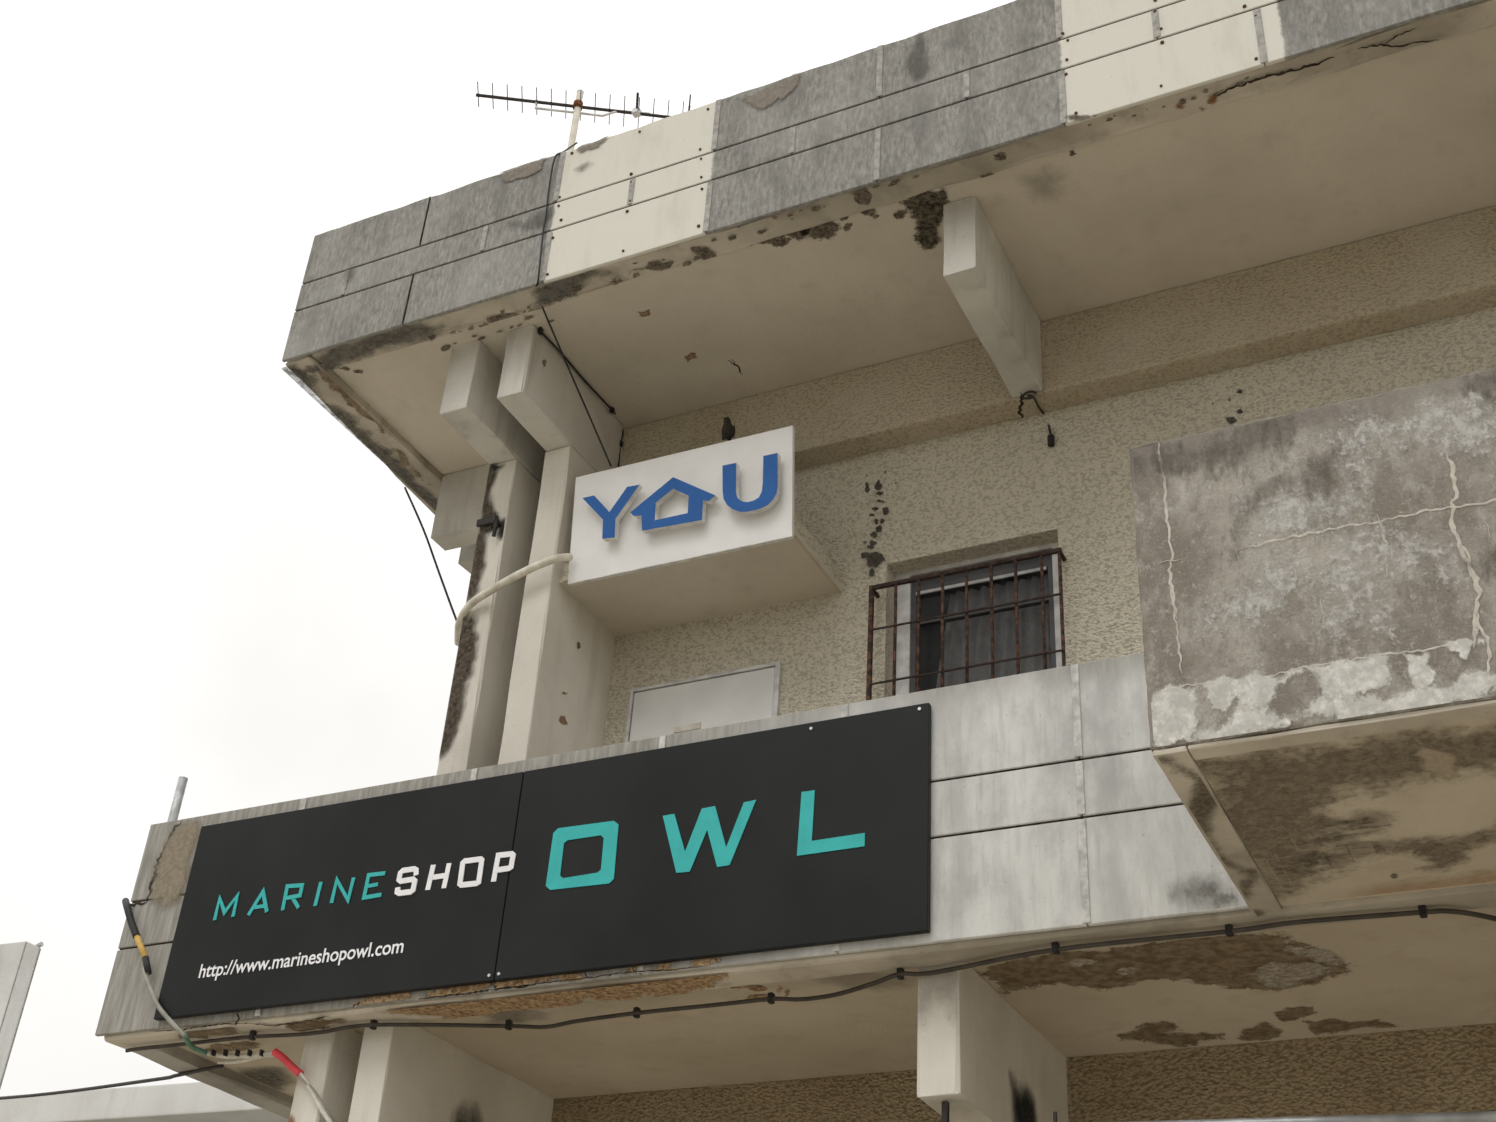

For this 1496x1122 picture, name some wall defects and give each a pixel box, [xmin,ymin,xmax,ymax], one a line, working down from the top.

crack [1208,28,1434,104]
spalling [610,175,951,285]
spalling [427,286,582,351]
water stain [534,272,597,306]
water stain [282,326,441,511]
crack [1155,442,1496,694]
peeling [1151,628,1496,747]
peeling [1415,726,1467,780]
water stain [1158,731,1496,916]
peeling [977,932,1396,1048]